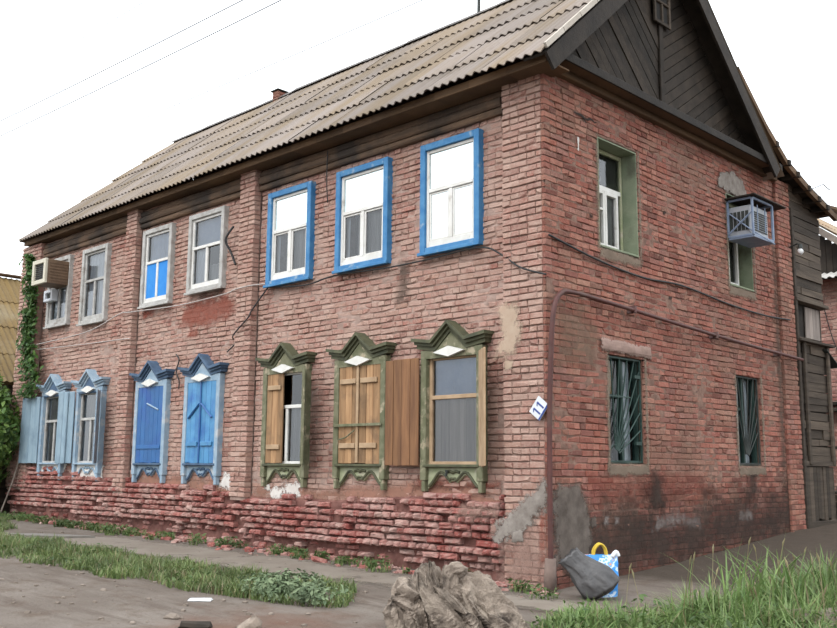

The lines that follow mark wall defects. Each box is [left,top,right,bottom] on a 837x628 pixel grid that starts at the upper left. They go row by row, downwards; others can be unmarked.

spalling [5,466,523,572]
leakage [589,472,791,576]